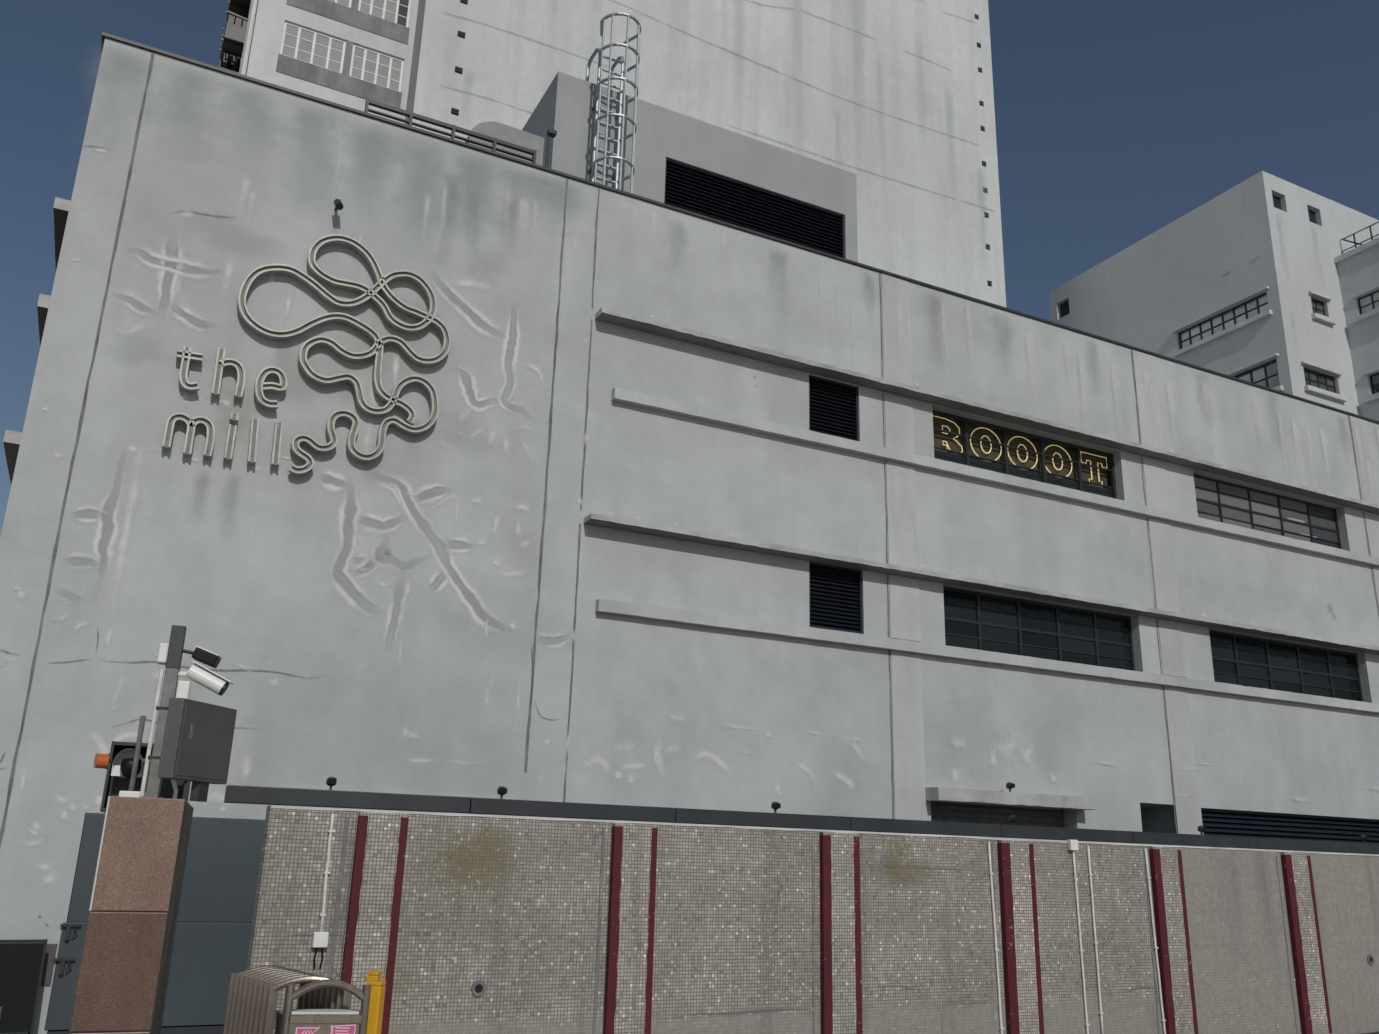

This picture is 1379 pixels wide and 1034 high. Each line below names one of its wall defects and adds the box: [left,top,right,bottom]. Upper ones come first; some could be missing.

crack [139,661,293,676]